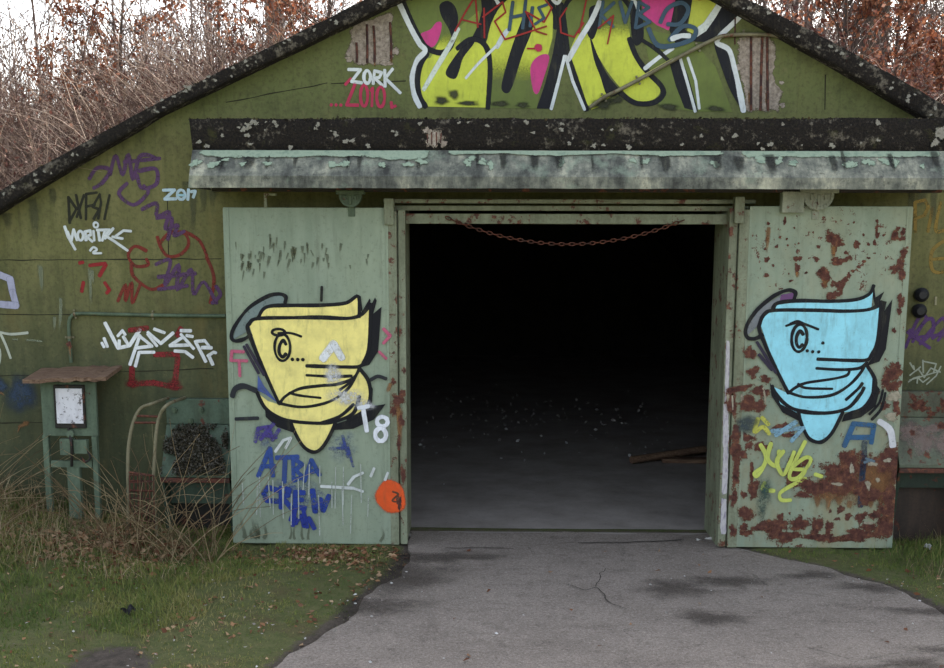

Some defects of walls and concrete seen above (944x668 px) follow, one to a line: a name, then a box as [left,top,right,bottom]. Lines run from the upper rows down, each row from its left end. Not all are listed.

spalling [344,13,399,66]
spalling [734,18,785,113]
peeling [188,126,724,170]
corrosion [763,217,800,277]
corrosion [788,219,908,315]
corrosion [387,377,406,451]
corrosion [724,345,898,545]
corrosion [880,361,944,422]